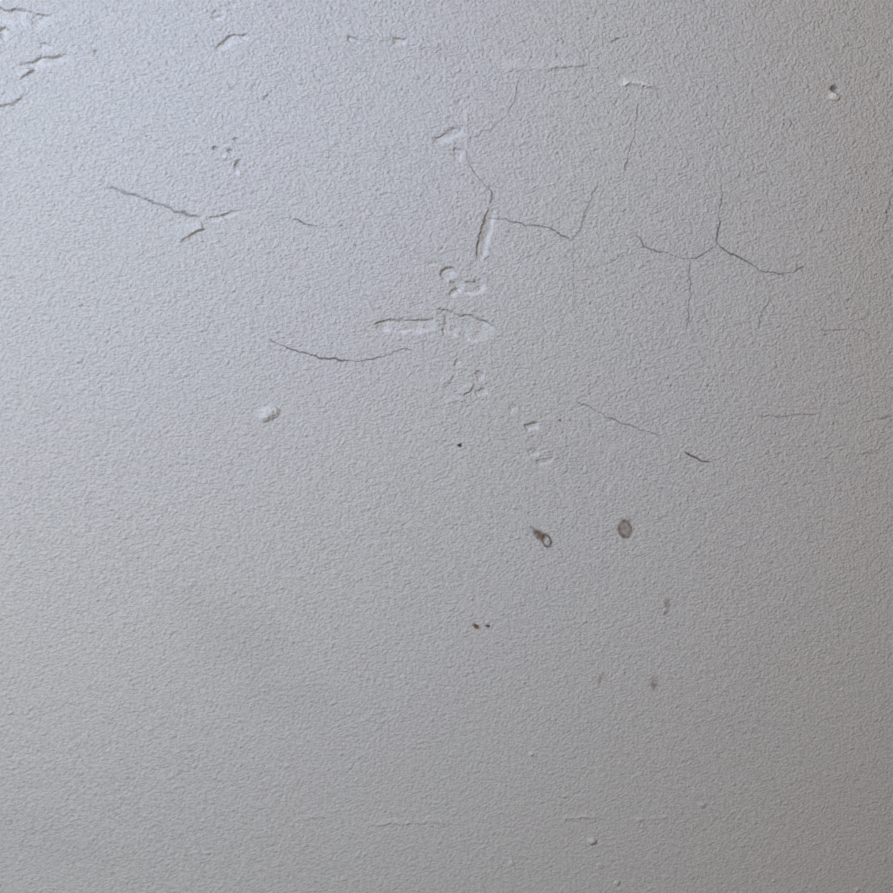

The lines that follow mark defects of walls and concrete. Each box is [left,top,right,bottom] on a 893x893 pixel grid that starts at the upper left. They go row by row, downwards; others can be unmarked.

spalling [0,5,81,110]
crack [419,94,481,166]
crack [96,183,246,249]
crack [473,192,503,276]
spalling [420,259,493,304]